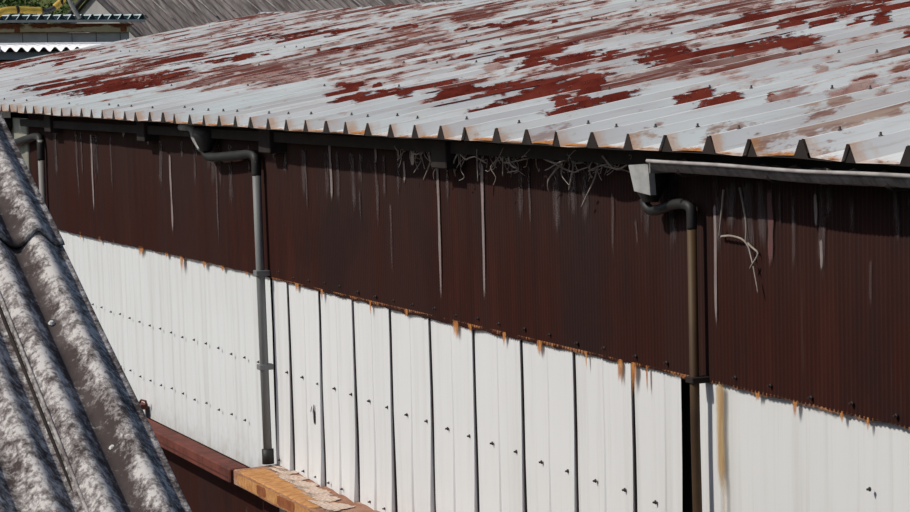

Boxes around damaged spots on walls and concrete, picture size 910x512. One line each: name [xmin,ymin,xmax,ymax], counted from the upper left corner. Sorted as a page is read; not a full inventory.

rust [372,23,435,38]
rust [0,25,363,97]
rust [522,336,591,366]
rust [602,355,648,388]
rust [709,381,873,481]
rust [236,468,336,512]
peeling [270,465,354,511]